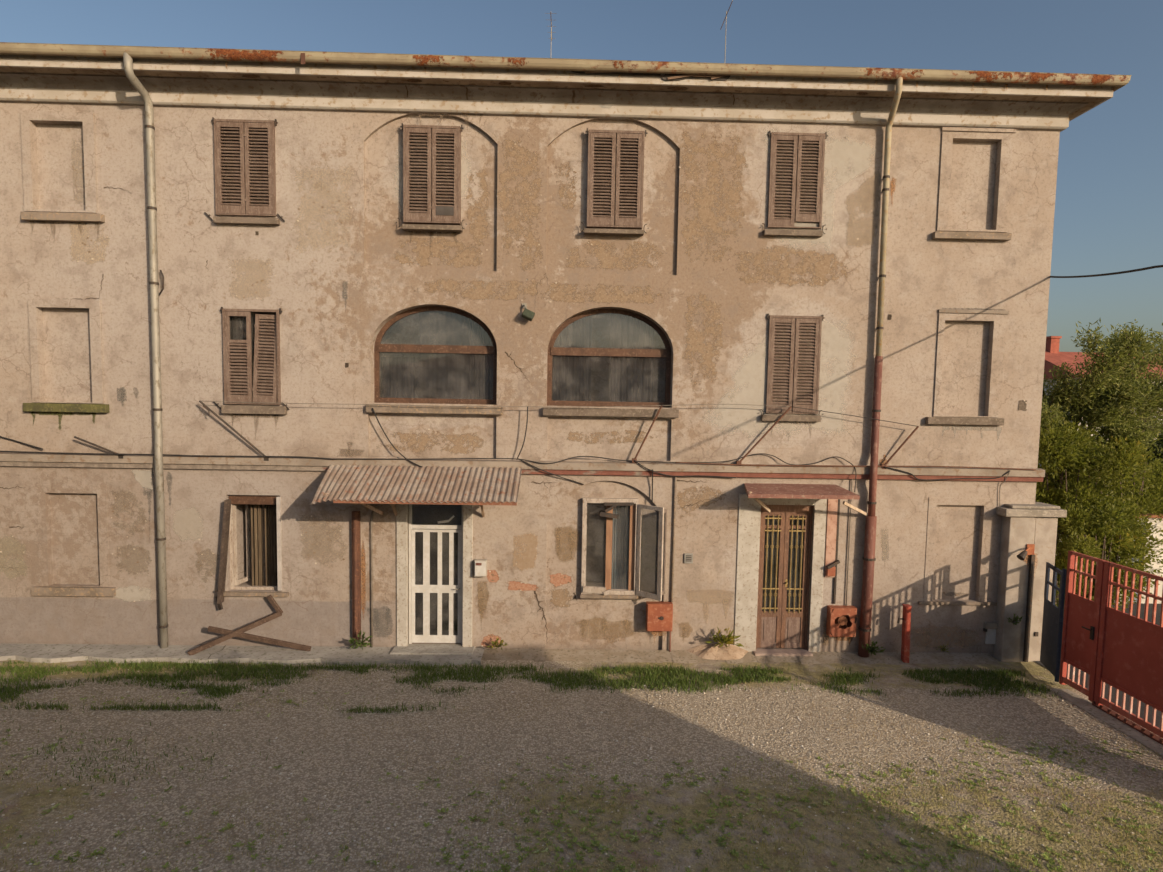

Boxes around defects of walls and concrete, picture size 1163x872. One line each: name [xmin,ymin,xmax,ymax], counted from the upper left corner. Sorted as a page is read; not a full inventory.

rust [413,55,444,70]
rust [964,71,1057,90]
rust [1091,75,1110,85]
peeling [395,140,542,271]
peeling [566,240,663,271]
peeling [735,246,847,287]
peeling [387,429,484,454]
peeling [567,430,653,444]
peeling [487,534,572,608]